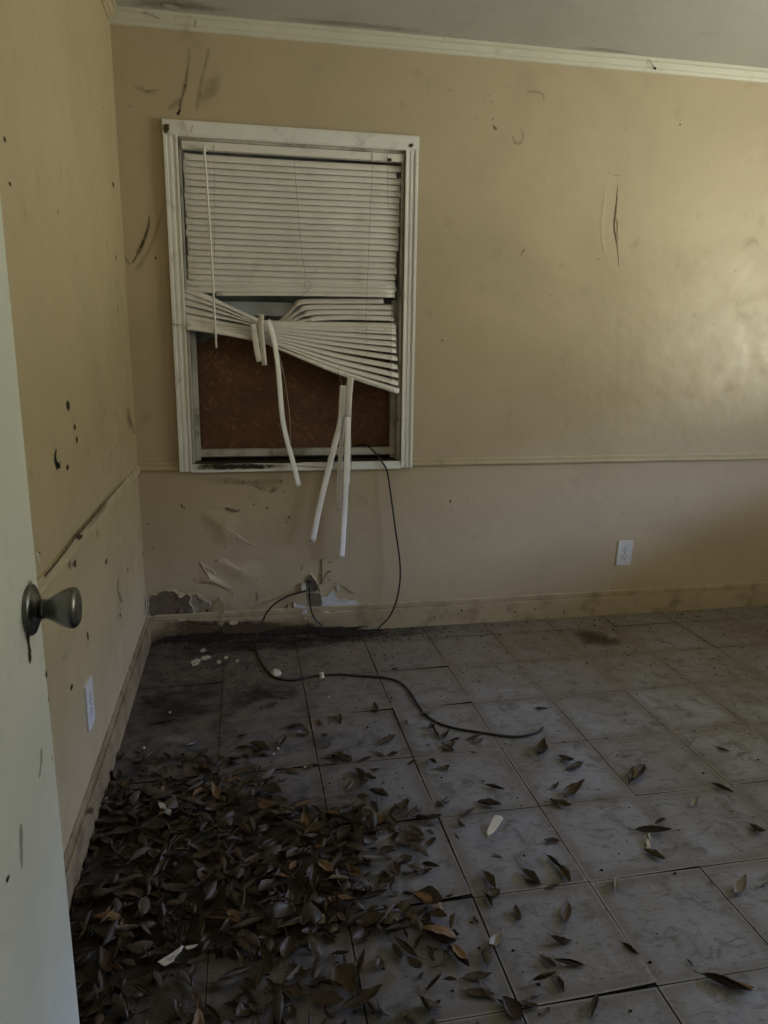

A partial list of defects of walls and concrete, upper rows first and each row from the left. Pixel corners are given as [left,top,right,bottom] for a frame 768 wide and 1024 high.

flaking render [147,588,238,626]